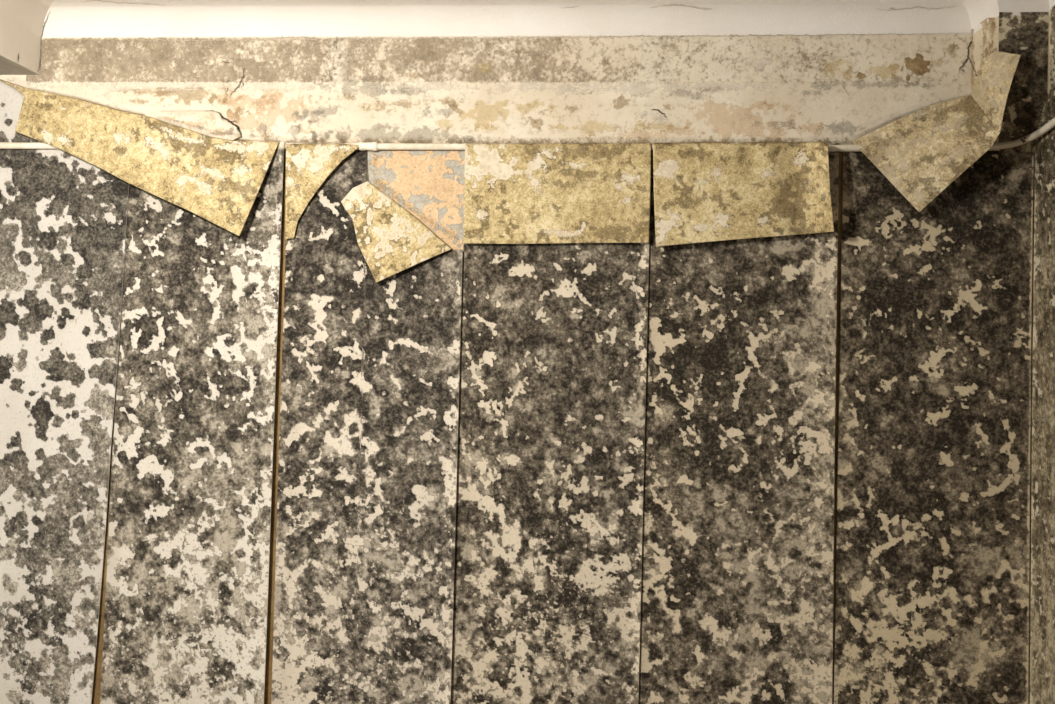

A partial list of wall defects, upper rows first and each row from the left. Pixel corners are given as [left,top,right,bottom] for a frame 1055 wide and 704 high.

peeling [40,79,325,92]
water stain [26,37,637,83]
flaking render [901,53,930,83]
peeling [971,18,997,89]
mould [0,131,38,143]
peeling [367,150,465,252]
mould [0,148,284,704]
water stain [271,128,1055,704]